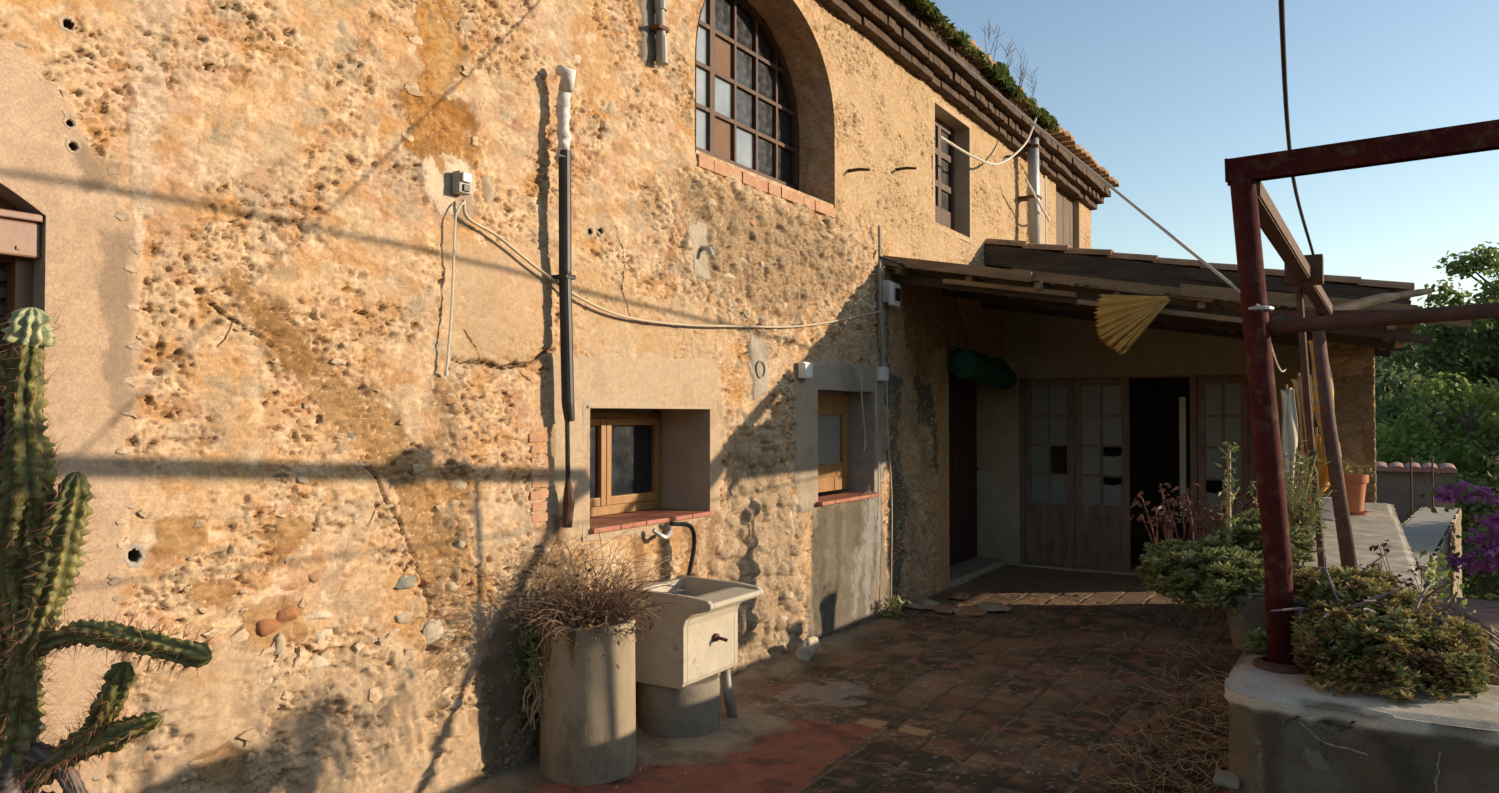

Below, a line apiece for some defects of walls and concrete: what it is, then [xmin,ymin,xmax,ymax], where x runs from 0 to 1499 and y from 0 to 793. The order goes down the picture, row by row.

crack [451,328,552,384]
water stain [807,303,938,639]